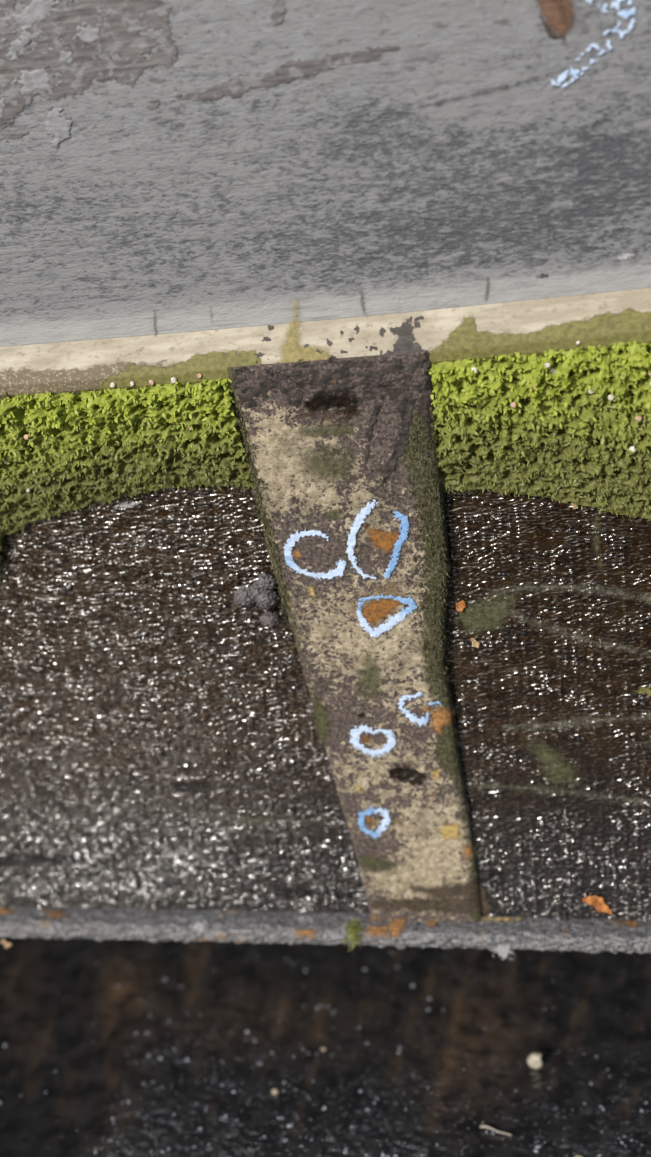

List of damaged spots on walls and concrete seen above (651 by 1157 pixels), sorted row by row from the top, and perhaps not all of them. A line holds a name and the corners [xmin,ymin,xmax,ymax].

corrosion [537,0,575,38]
peeling [0,0,178,149]
peeling [175,45,400,101]